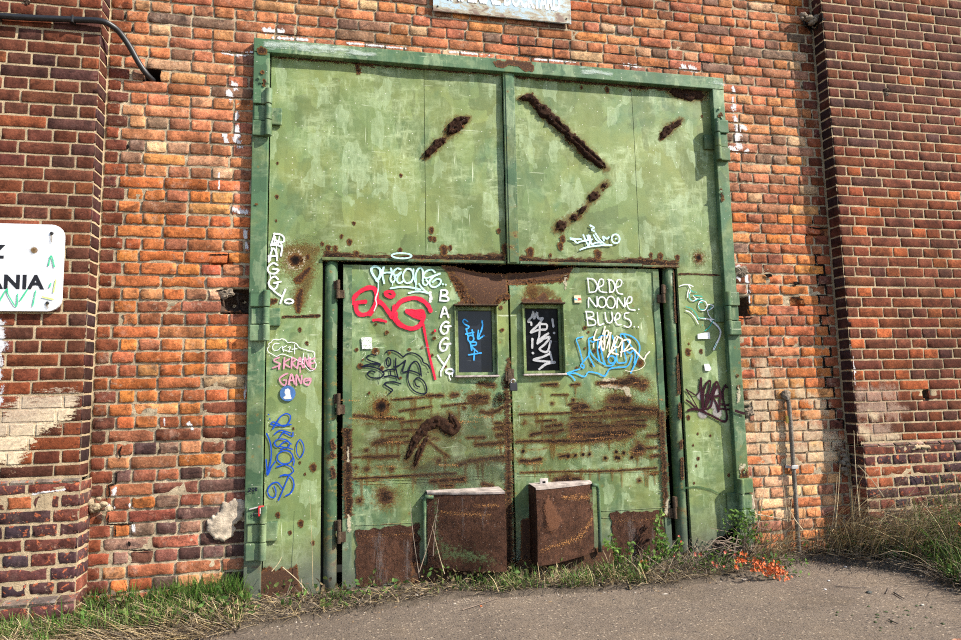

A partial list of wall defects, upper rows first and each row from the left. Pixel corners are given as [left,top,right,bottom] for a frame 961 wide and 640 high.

rust [257,46,709,102]
rust [278,92,720,346]
spalling [219,288,249,313]
rust [676,343,703,421]
rust [329,357,712,584]